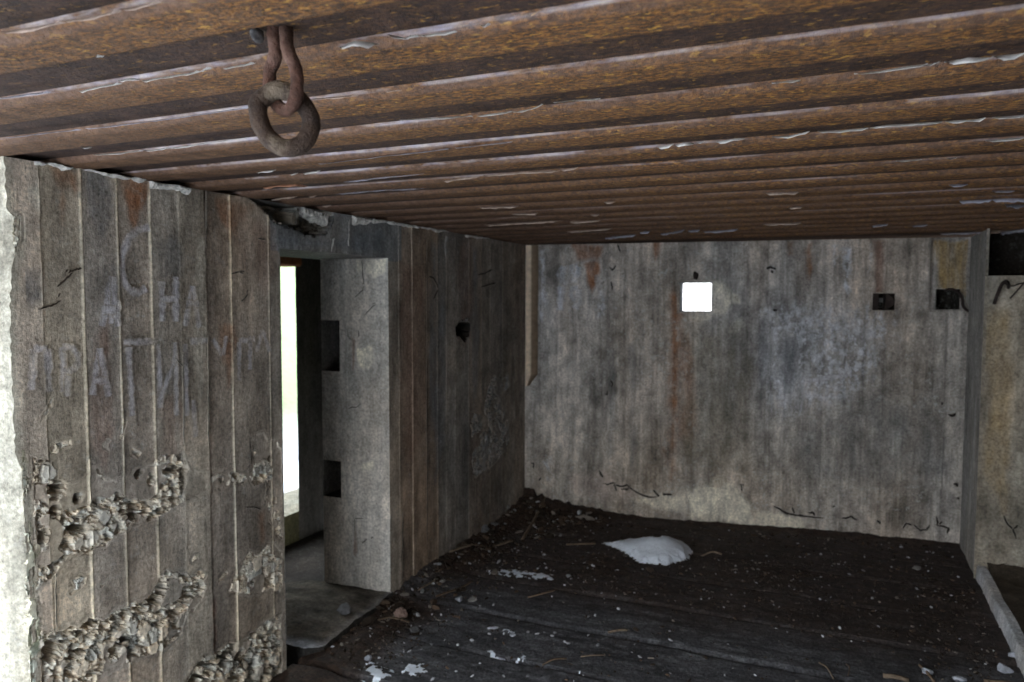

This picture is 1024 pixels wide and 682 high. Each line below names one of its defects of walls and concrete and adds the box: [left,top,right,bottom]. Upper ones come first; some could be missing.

peeling [854,53,1024,74]
peeling [772,115,1024,139]
corrosion [661,283,687,484]
crack [599,470,672,498]
crack [773,505,951,534]
spalling [21,417,285,682]